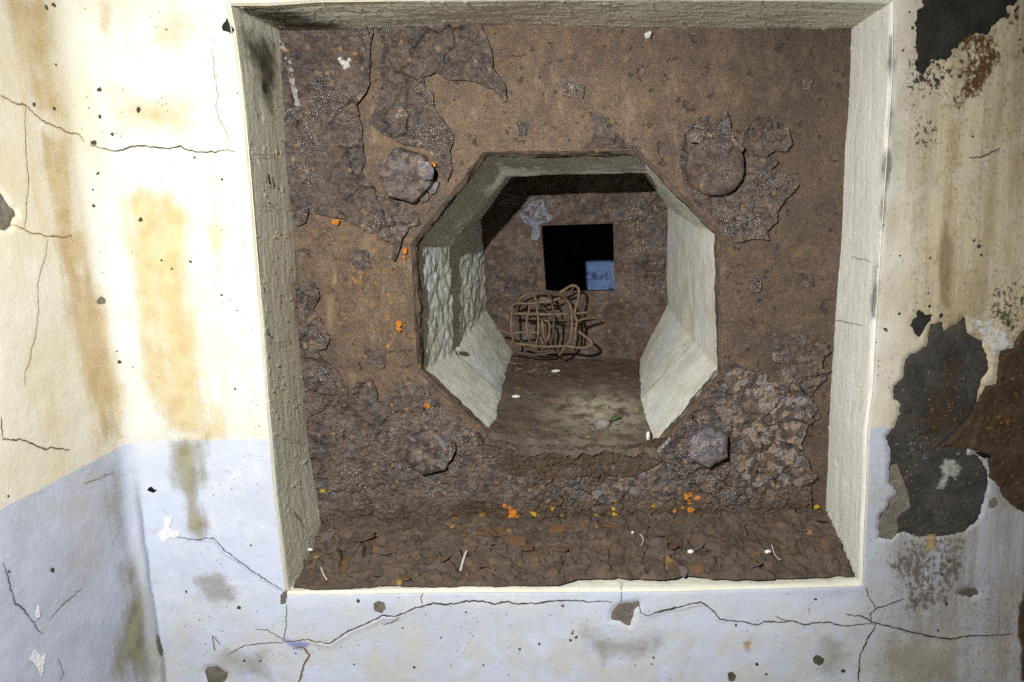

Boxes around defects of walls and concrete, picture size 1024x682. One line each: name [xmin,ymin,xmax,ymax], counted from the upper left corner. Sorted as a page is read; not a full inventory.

rust [903,34,1000,110]
peeling [908,0,1019,89]
crack [2,49,230,385]
leakage [133,196,197,430]
leakage [175,443,206,534]
peeling [878,305,998,612]
rust [940,330,1024,512]
crack [178,538,1007,682]